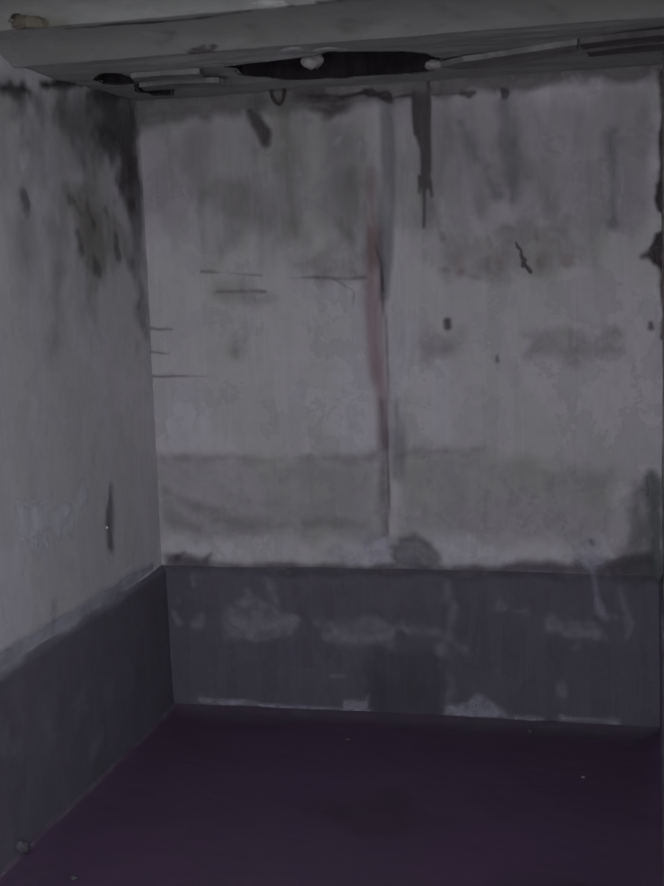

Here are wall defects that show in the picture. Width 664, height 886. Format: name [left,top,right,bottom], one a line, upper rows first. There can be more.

spalling [224,46,445,80]
damp [92,64,663,228]